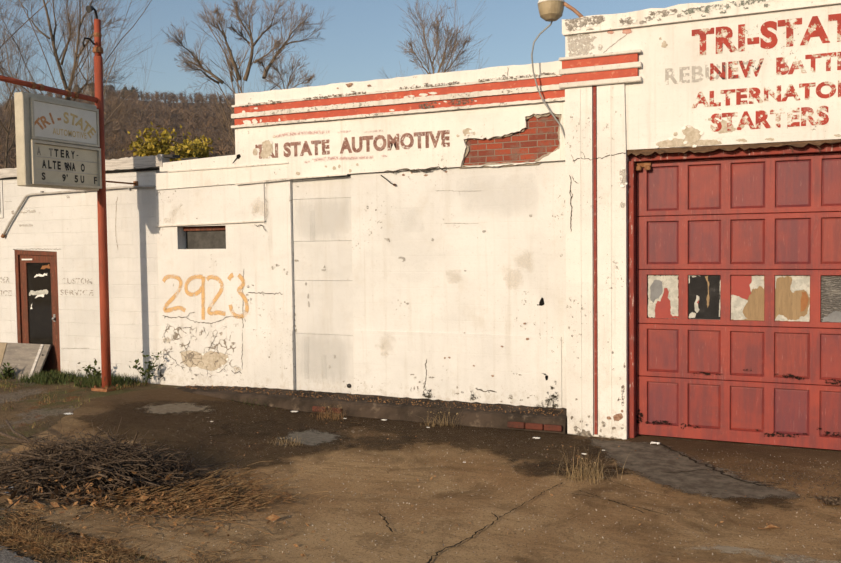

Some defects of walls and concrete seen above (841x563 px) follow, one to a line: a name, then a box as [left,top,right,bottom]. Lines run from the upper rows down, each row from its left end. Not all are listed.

peeling [565,16,604,57]
peeling [607,0,771,34]
flaking render [444,114,559,169]
peeling [655,118,747,148]
crack [569,152,627,230]
peeling [648,275,678,318]
peeling [688,275,710,318]
peeling [731,275,764,320]
peeling [775,275,810,322]
peeling [822,311,841,322]
peeling [161,326,241,380]